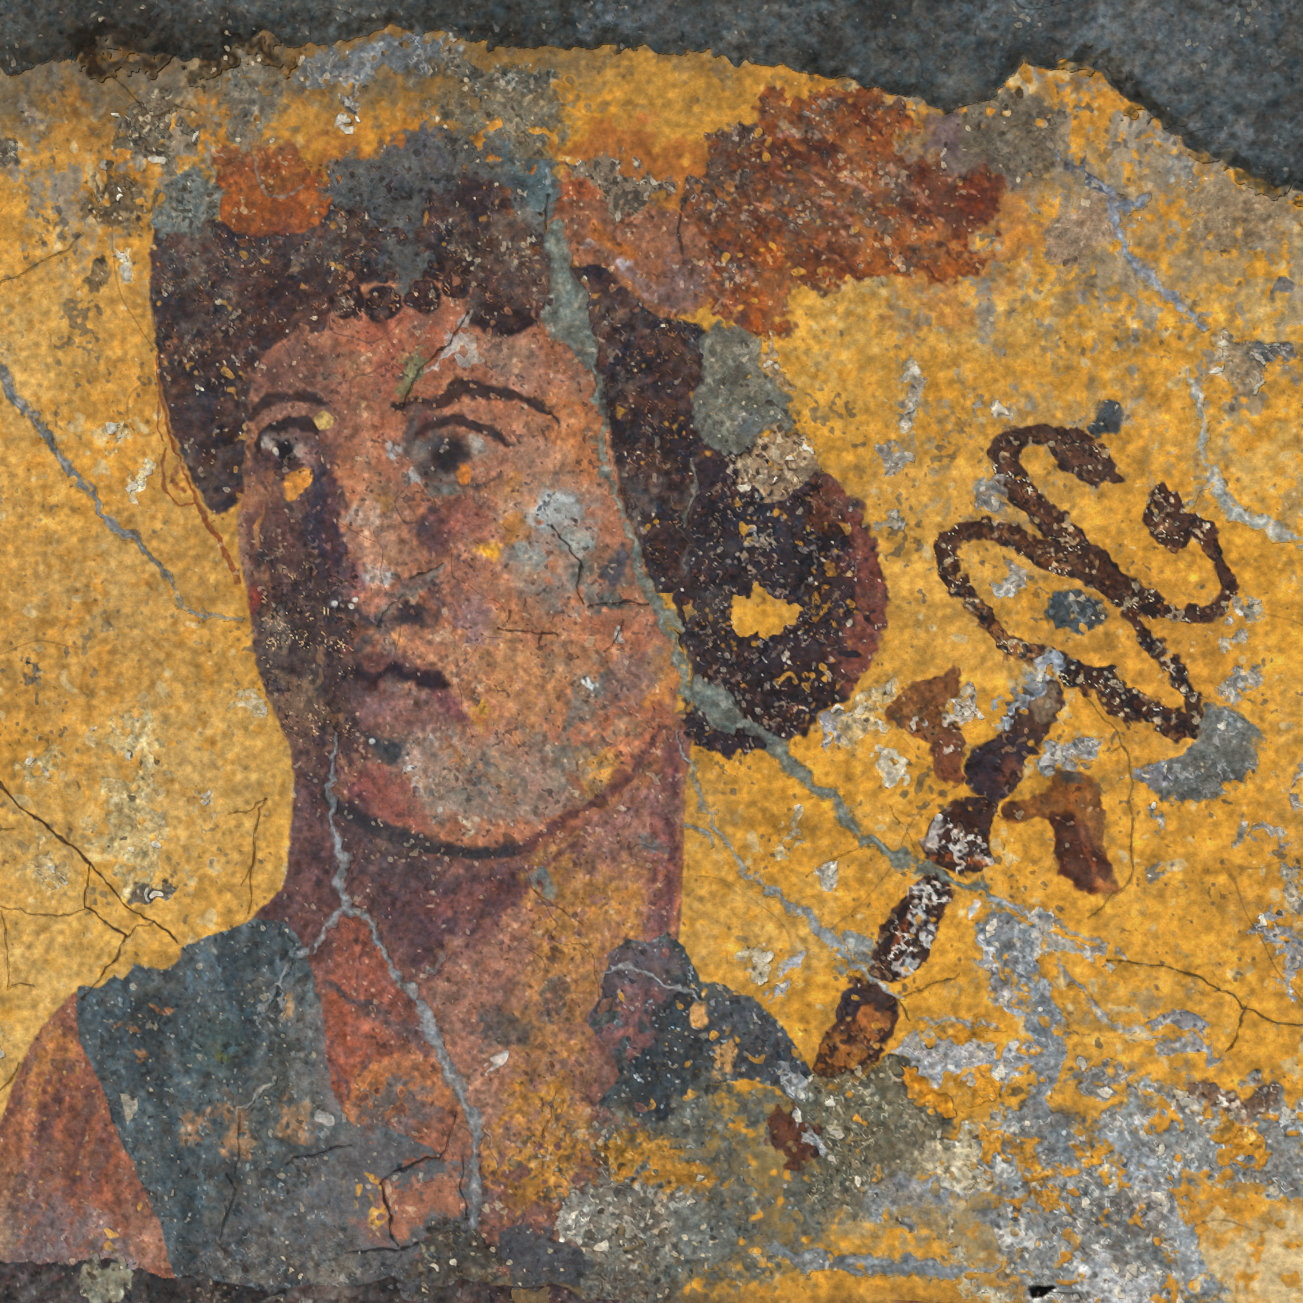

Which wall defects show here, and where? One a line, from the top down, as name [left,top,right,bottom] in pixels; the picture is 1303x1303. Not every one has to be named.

flaking render [76,47,286,295]
flaking render [334,74,362,135]
crack [0,360,244,623]
crack [533,177,1303,1069]
crack [0,780,179,1000]
crack [219,1075,277,1238]
crack [228,797,269,915]
crack [256,730,487,1255]
flaking render [553,1115,735,1303]
flaking render [733,925,879,1004]
flaking render [812,860,839,893]
flaking render [771,898,1303,1303]